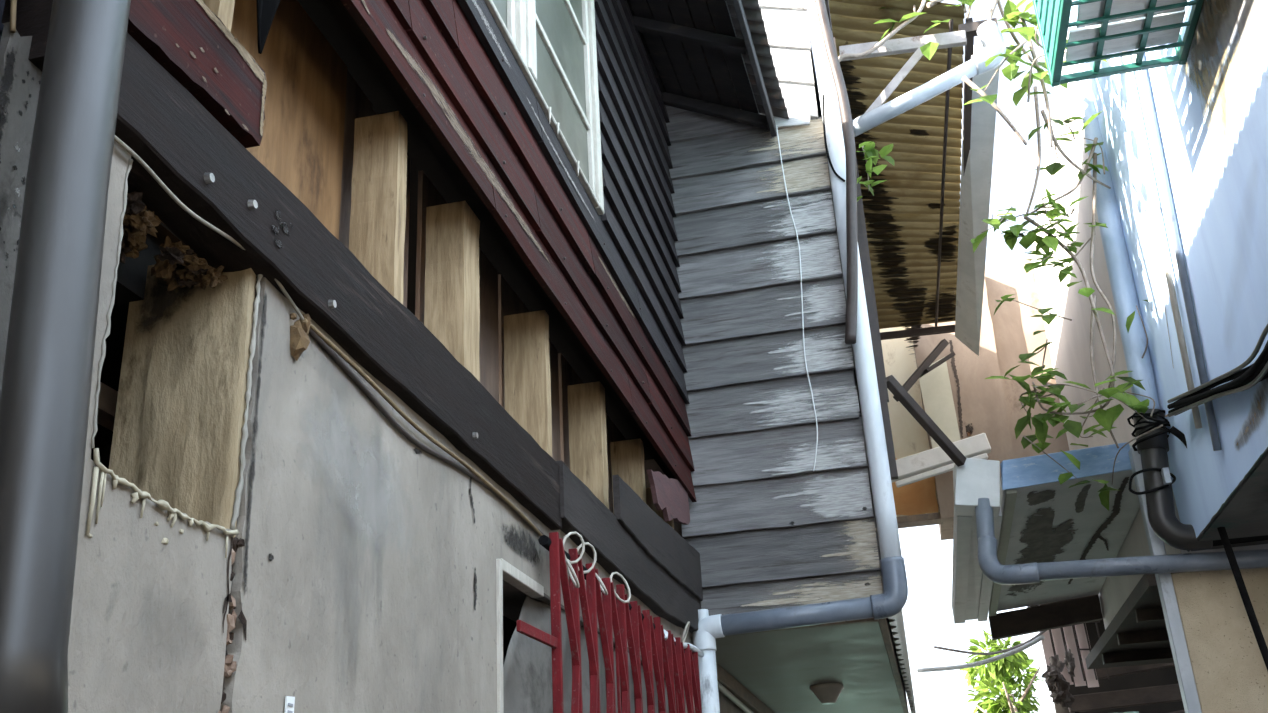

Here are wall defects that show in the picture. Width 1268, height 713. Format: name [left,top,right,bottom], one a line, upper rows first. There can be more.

leakage [1187,0,1261,164]
spalling [91,158,133,448]
crack [218,281,267,713]
spalling [230,274,263,530]
peeling [750,118,854,373]
peeling [744,386,860,426]
peeling [741,439,883,607]